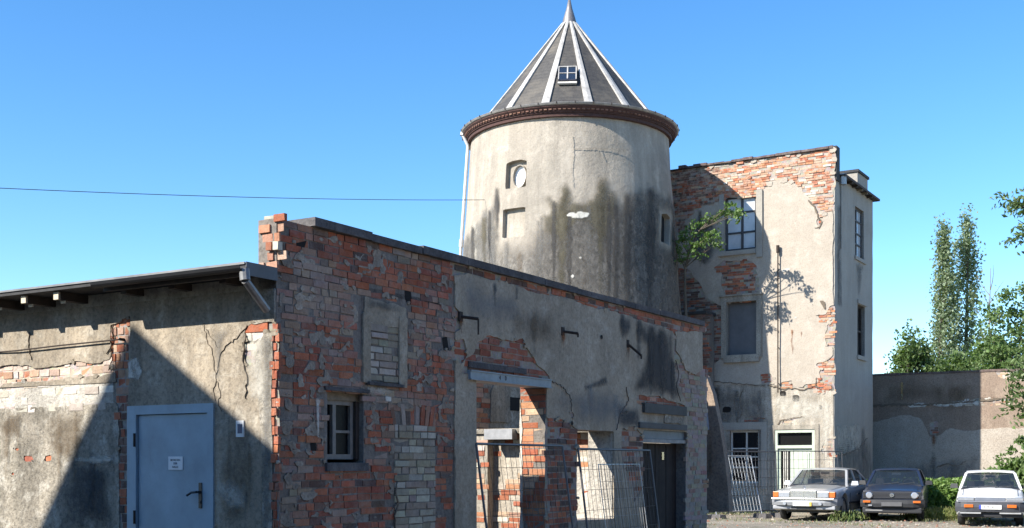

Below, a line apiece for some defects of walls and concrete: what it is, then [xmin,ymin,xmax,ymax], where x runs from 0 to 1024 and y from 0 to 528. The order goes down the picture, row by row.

flaking render [670,147,837,239]
water stain [463,184,682,315]
flaking render [0,316,130,528]
crack [204,325,260,411]
flaking render [442,258,761,528]
water stain [621,316,678,396]
flaking render [759,305,837,409]